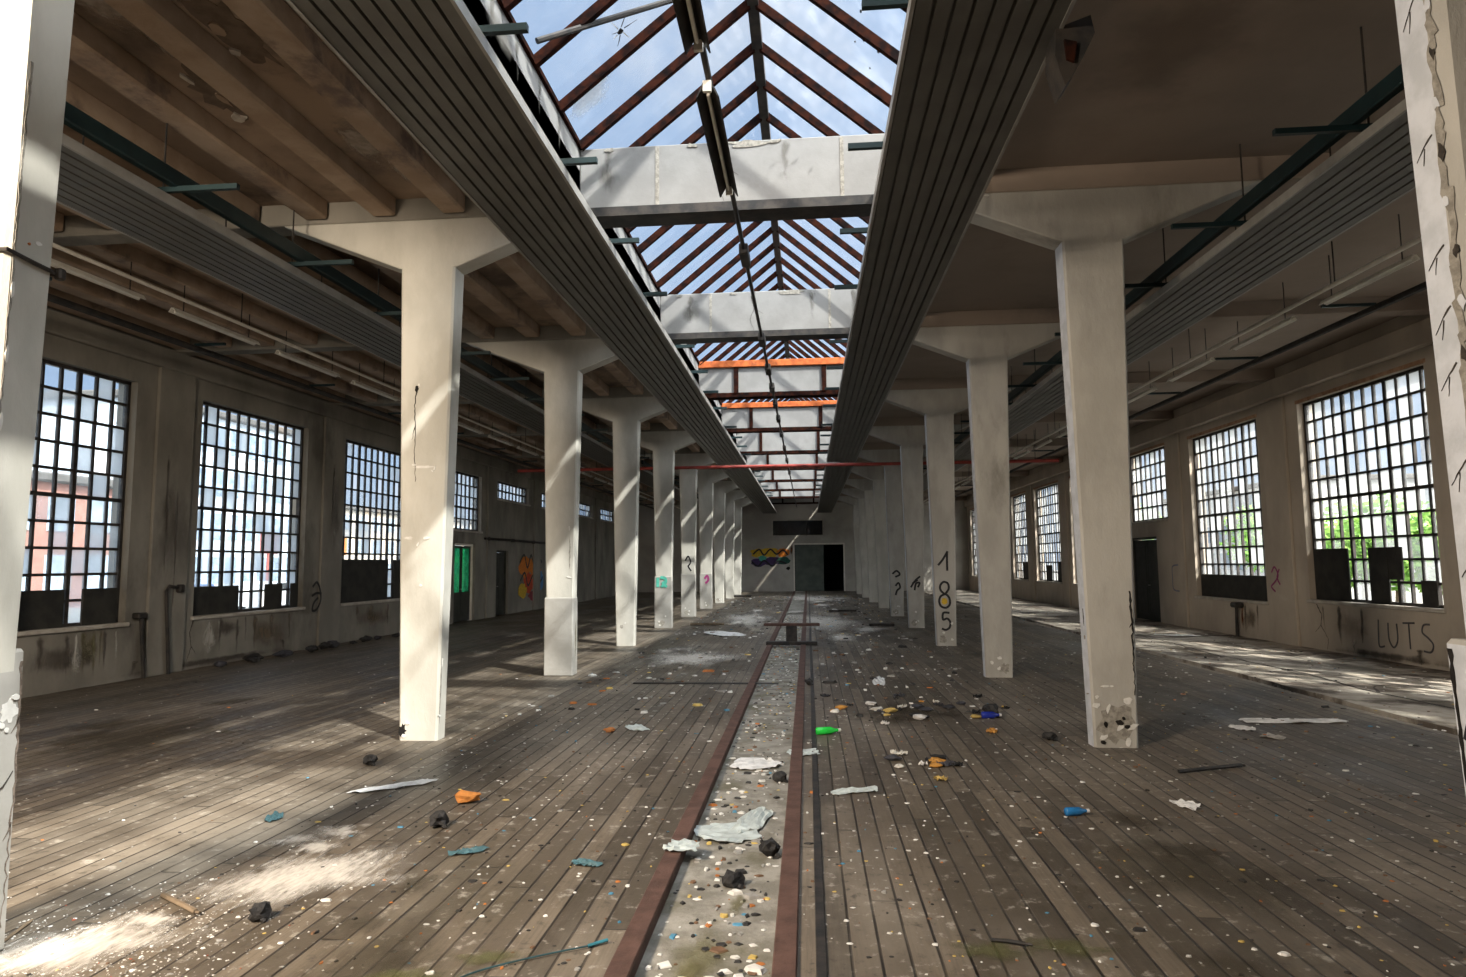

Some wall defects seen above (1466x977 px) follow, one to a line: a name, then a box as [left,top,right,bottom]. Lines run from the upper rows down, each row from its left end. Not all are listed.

crack [0,61,34,431]
spalling [1423,0,1466,419]
crack [0,661,24,928]